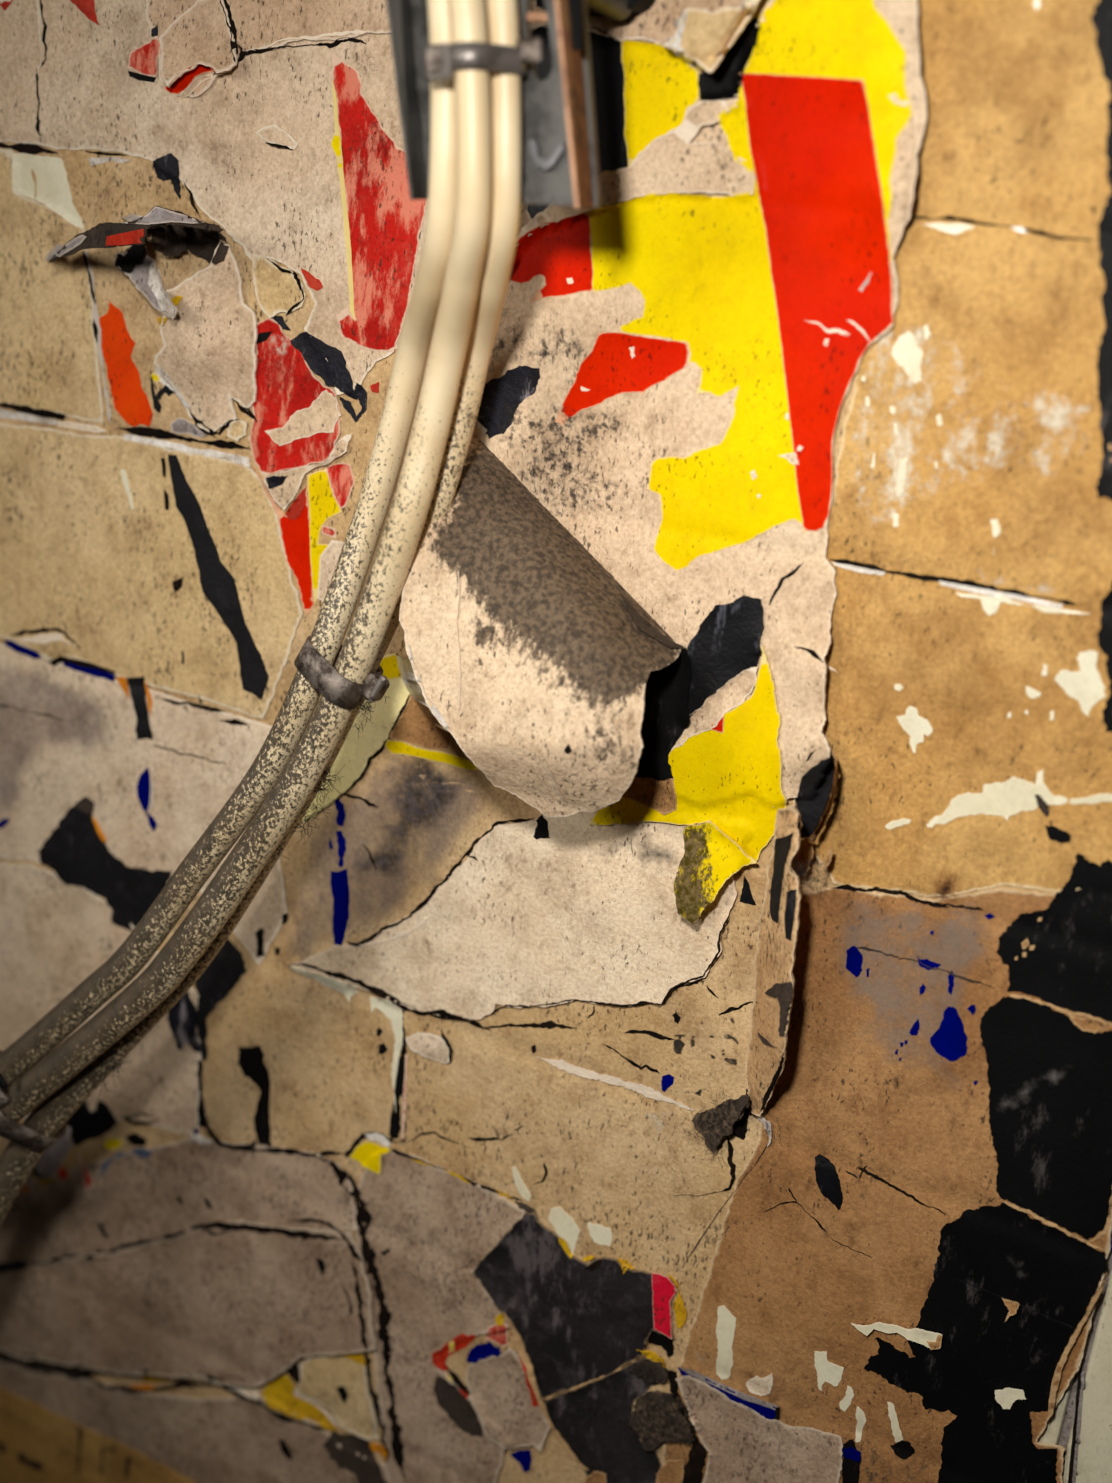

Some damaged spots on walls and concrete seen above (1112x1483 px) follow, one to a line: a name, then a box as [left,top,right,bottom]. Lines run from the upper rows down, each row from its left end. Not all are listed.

crack [220,0,367,63]
crack [289,818,778,1074]
peeling [1015,938,1035,960]
crack [120,1112,159,1125]
crack [0,1130,406,1483]
peeling [1002,1298,1020,1322]
peeling [995,1388,1026,1409]